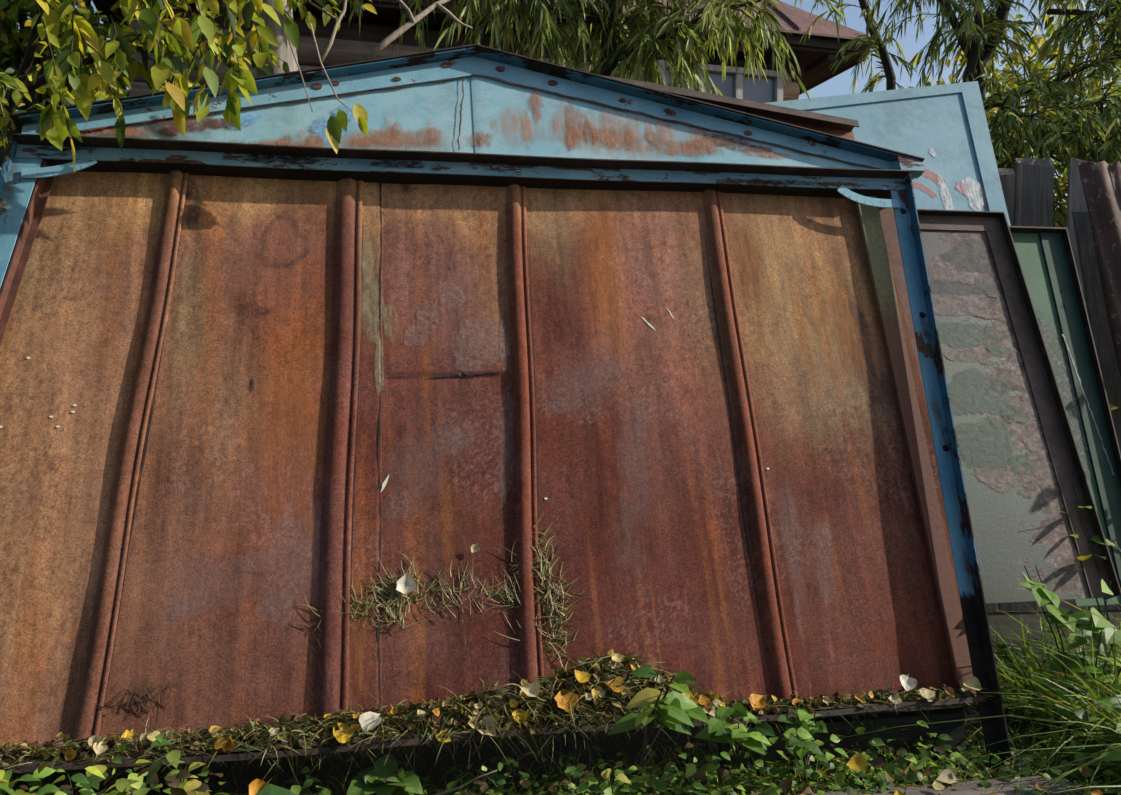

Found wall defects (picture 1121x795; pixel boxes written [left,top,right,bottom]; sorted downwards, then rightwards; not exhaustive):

rust [349,122,441,147]
rust [471,134,490,146]
rust [566,109,783,158]
peeling [1040,317,1115,478]
peeling [975,389,1058,498]